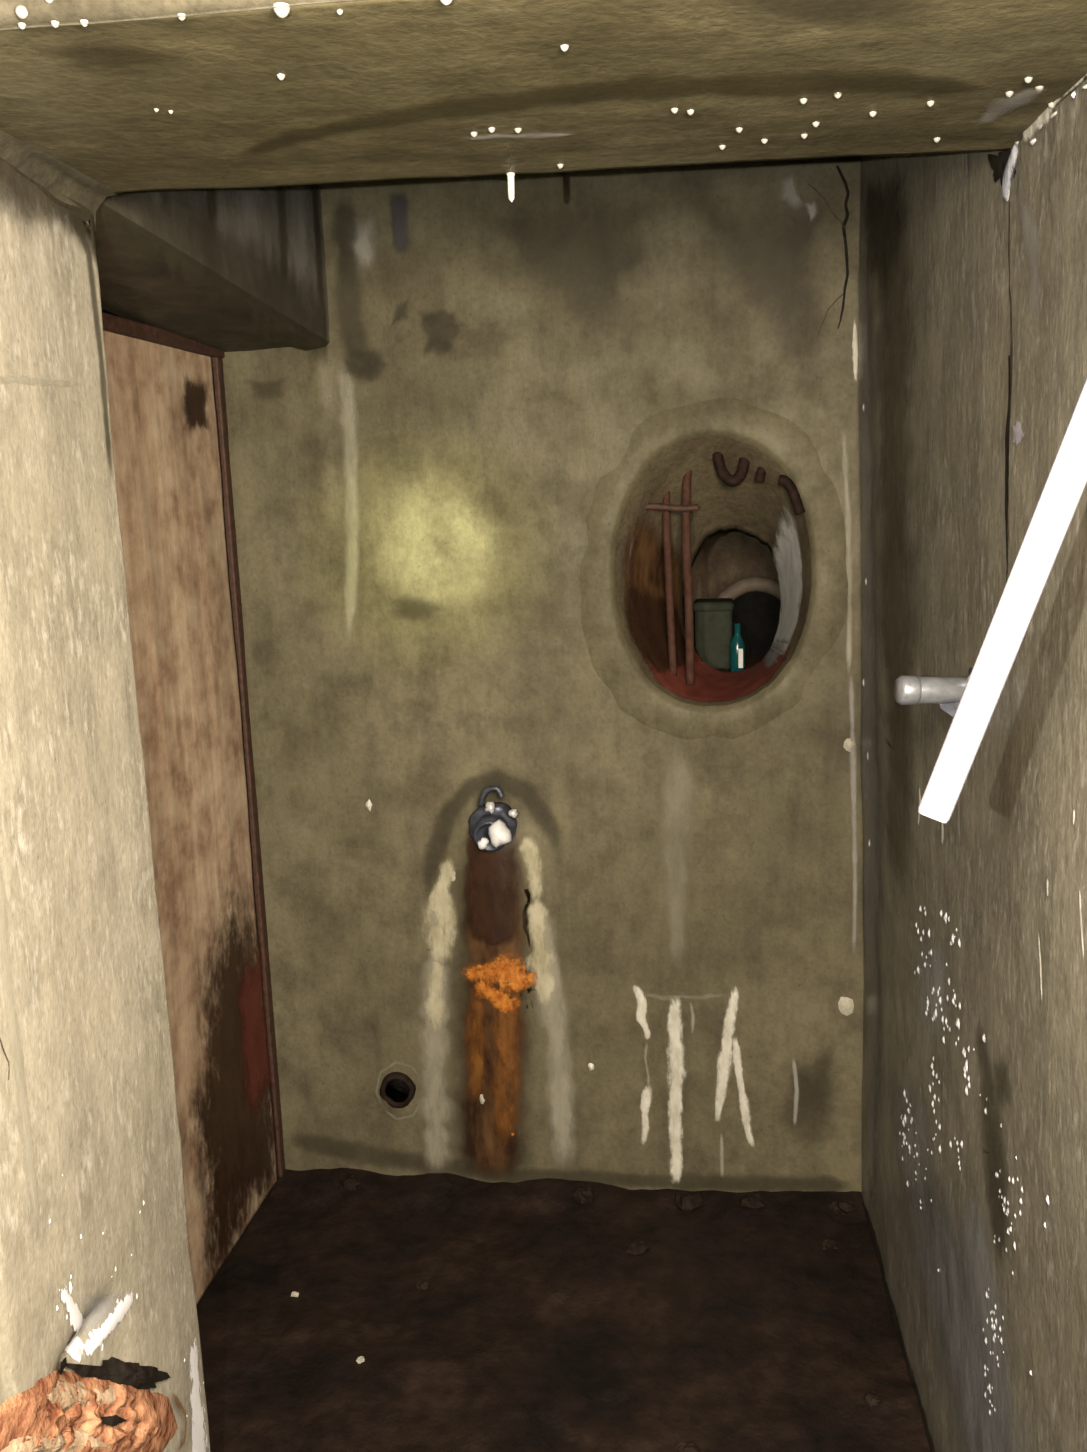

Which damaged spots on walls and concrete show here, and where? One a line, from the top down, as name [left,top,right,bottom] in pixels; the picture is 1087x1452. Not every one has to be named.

crack [808,165,849,335]
crack [1005,201,1024,582]
corrosion [427,773,556,879]
corrosion [464,836,537,1172]
water stain [303,839,839,1191]
water stain [858,183,902,1178]
water stain [921,953,943,1024]
spalling [0,1275,210,1452]
water stain [863,1204,935,1452]
water stain [898,1040,1007,1452]